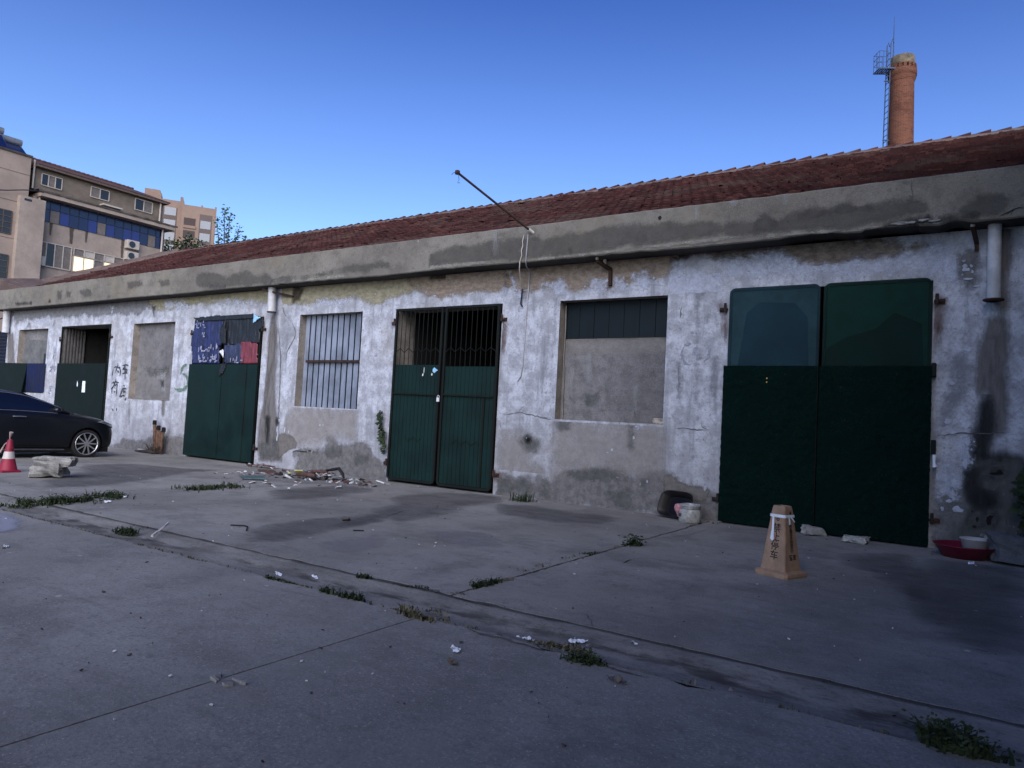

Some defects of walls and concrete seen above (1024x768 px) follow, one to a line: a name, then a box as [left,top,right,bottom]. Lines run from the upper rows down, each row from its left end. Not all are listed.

damp [429,200,961,298]
damp [964,229,1024,510]
peeling [496,435,718,522]